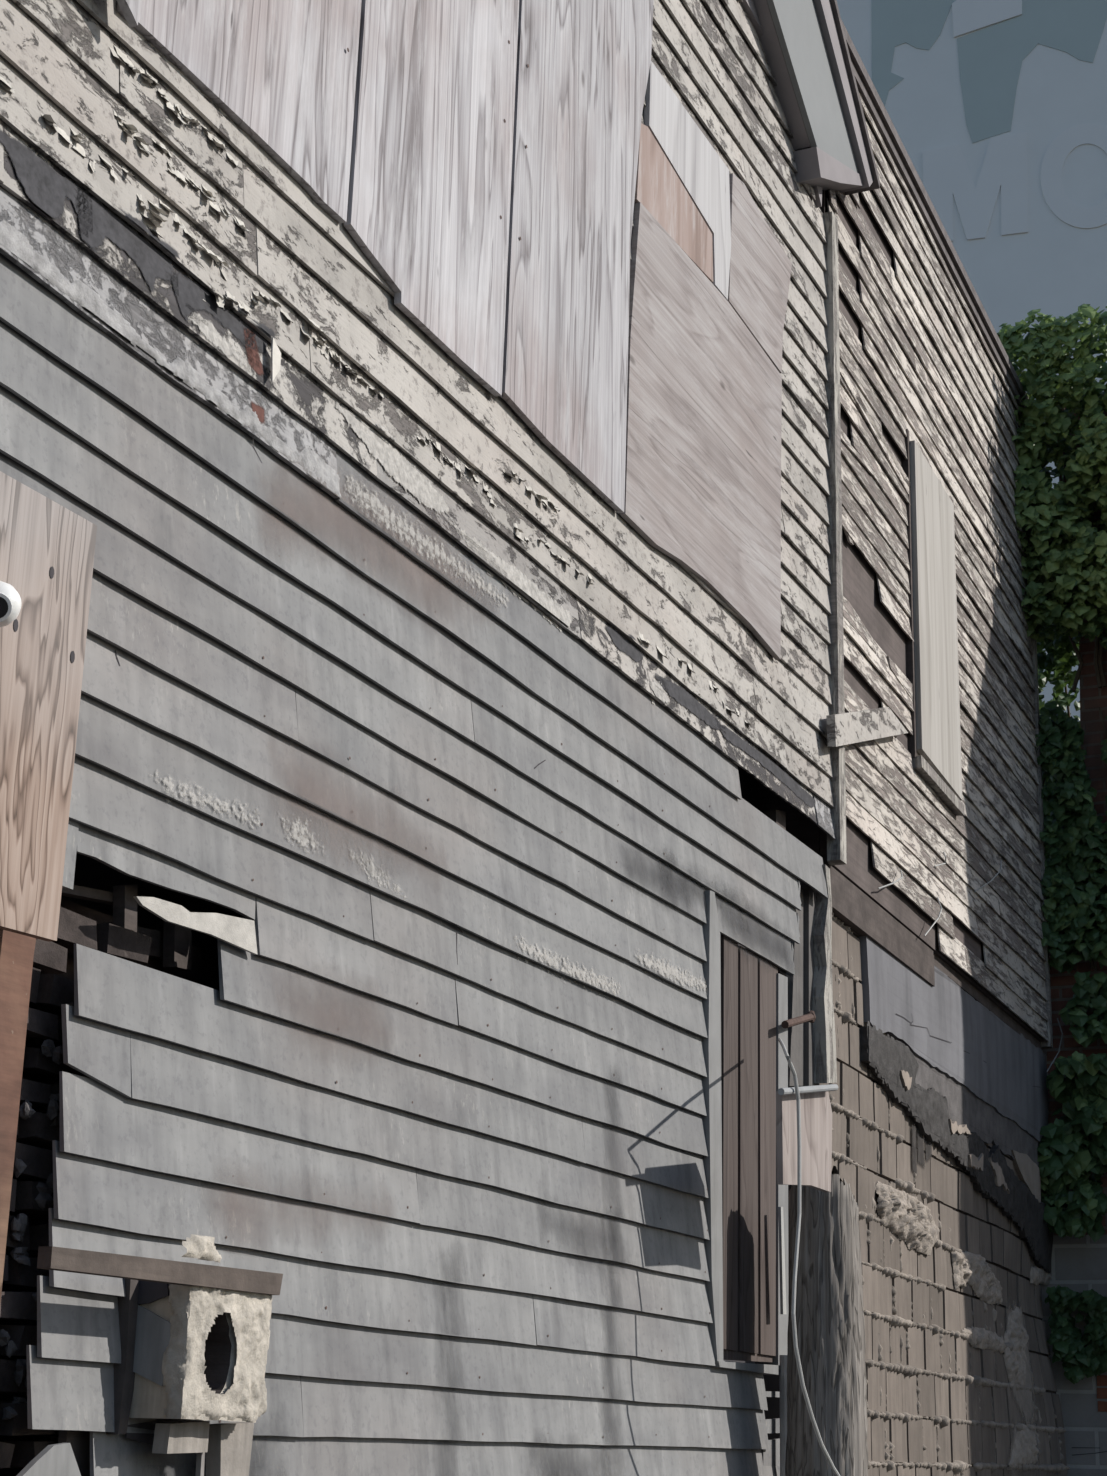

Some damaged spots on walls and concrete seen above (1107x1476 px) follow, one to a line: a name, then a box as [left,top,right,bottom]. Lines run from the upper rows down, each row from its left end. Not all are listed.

peeling [109,45,239,166]
peeling [0,109,385,399]
peeling [0,220,342,499]
peeling [417,436,497,507]
peeling [504,471,560,512]
peeling [514,523,595,585]
peeling [637,632,753,727]
flaking render [910,1050,1041,1179]
spalling [876,1181,939,1256]
spalling [951,1251,1029,1385]
spalling [1030,1266,1052,1286]
spalling [1008,1427,1039,1468]